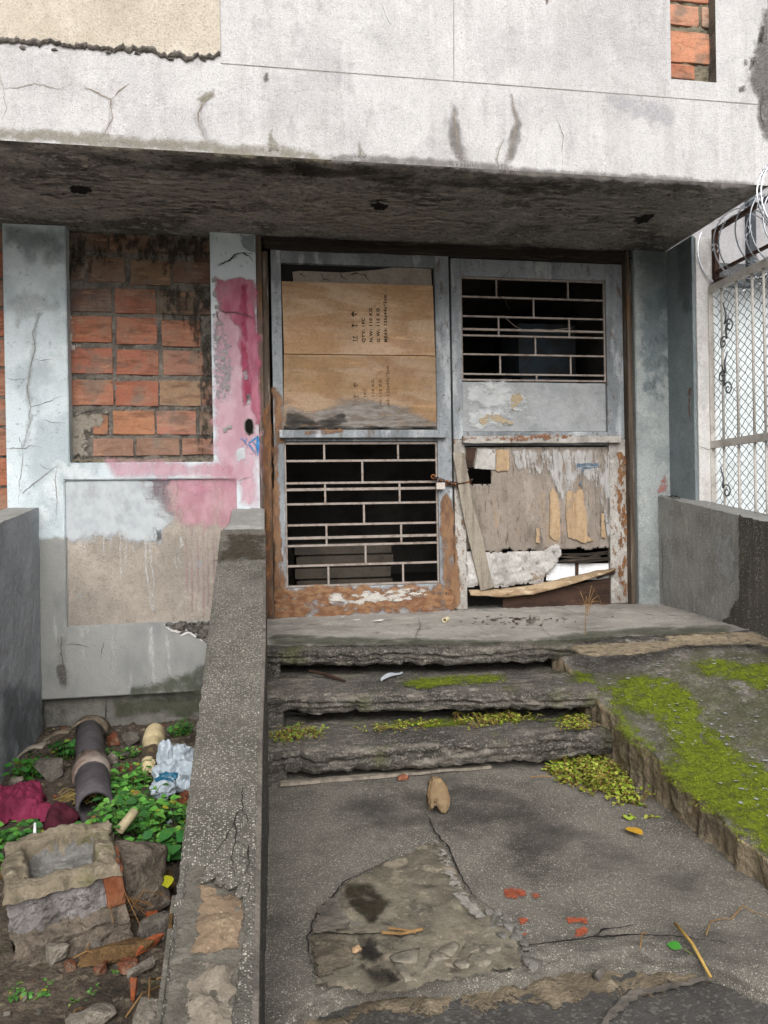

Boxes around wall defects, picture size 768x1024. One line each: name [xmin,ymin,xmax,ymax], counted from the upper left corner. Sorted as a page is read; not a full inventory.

spalling [0,36,221,63]
leakage [450,108,464,160]
leakage [505,95,520,161]
leakage [739,10,768,139]
crack [9,317,59,525]
spalling [223,418,254,435]
rust [262,387,461,618]
peeling [513,449,610,536]
rust [617,452,628,603]
crack [425,811,501,919]
spalling [145,862,251,1024]
crack [523,924,731,946]